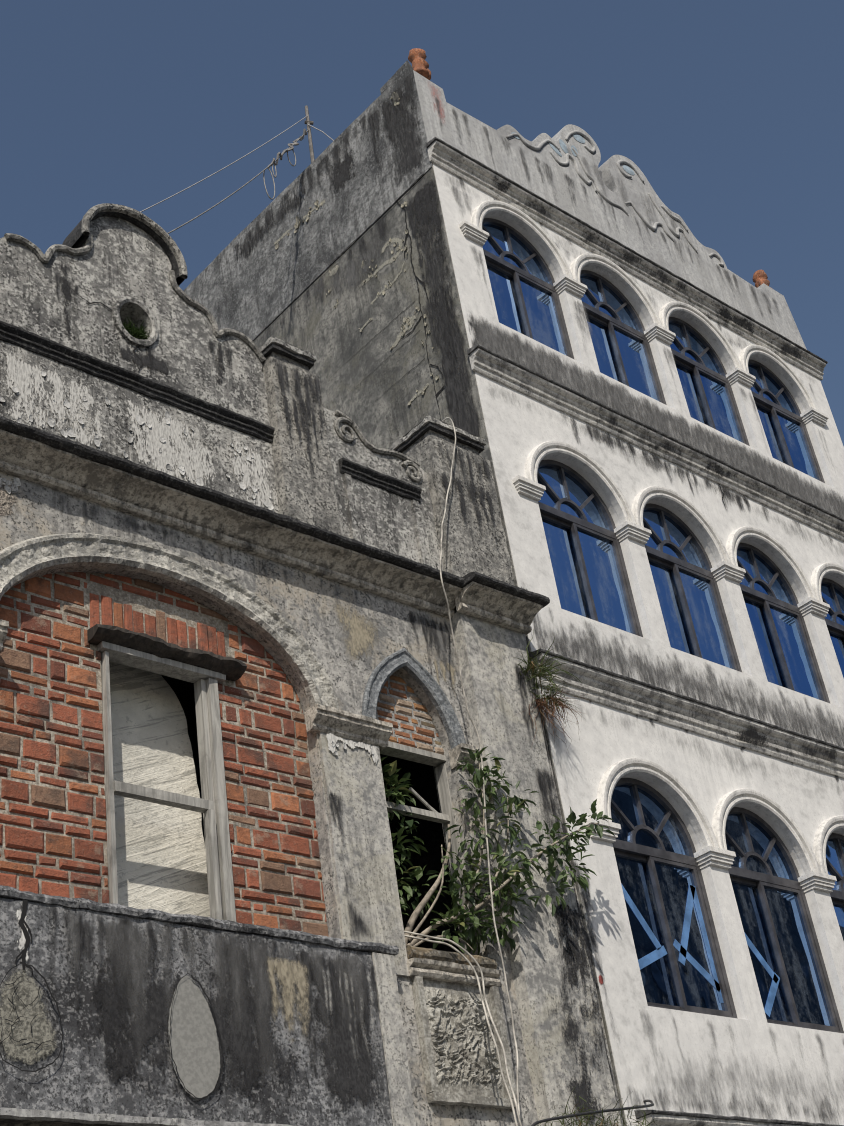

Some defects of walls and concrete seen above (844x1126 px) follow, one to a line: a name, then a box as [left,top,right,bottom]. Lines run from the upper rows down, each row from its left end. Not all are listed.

water stain [235,76,422,260]
water stain [485,128,586,199]
water stain [62,203,188,286]
crack [255,173,444,420]
peeling [0,351,111,447]
water stain [407,180,844,556]
spalling [0,477,21,516]
peeling [123,400,275,511]
water stain [329,792,342,830]
water stain [16,910,29,971]
crack [0,899,63,1072]
water stain [52,904,379,1110]